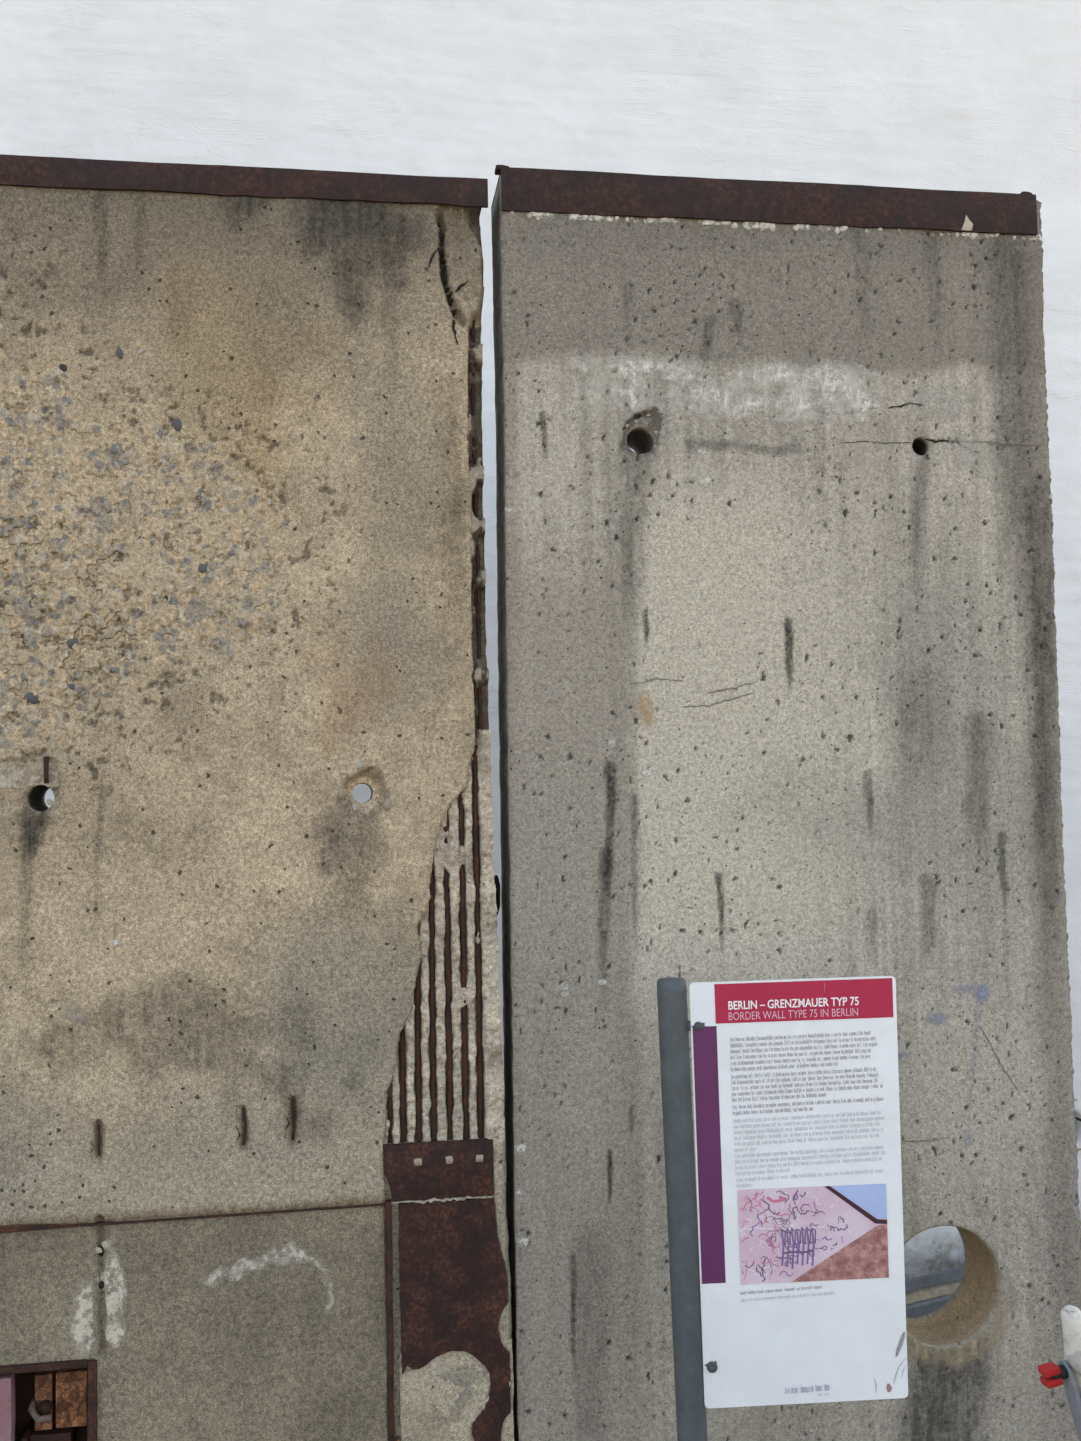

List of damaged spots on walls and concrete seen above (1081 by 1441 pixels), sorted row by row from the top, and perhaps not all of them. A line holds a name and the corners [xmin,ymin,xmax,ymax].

damp [307,199,407,310]
crack [429,220,468,345]
crack [842,402,1048,453]
spalling [383,320,505,1145]
damp [603,763,615,877]
corrosion [285,1099,295,1140]